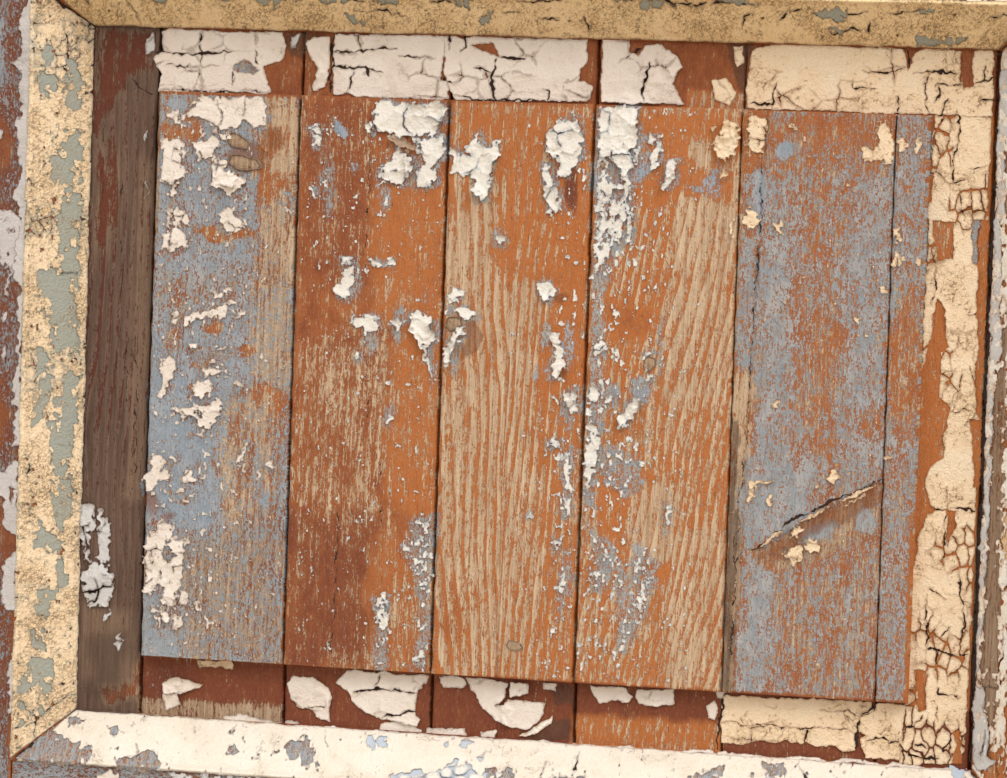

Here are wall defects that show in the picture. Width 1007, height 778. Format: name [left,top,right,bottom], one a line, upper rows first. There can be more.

crack [507,0,561,21]
crack [631,0,750,26]
crack [833,12,871,35]
crack [327,34,550,102]
peeling [0,0,86,447]
peeling [141,0,699,710]
crack [716,45,1007,777]
peeling [0,460,24,537]
peeling [0,551,16,611]
peeling [220,513,590,778]
peeling [19,716,261,778]